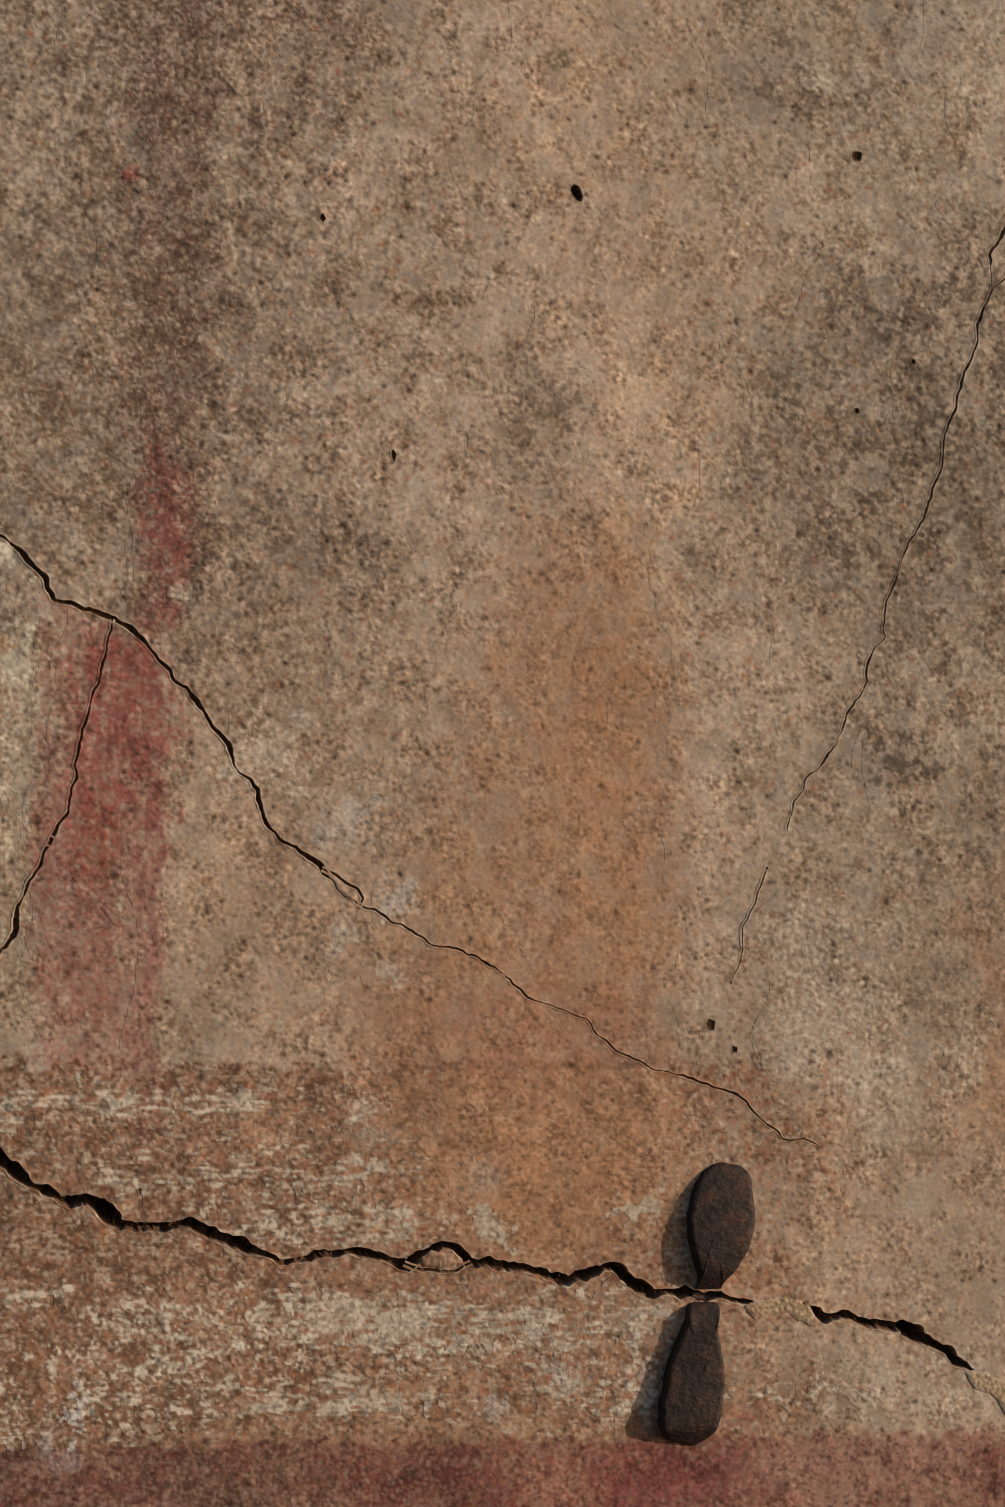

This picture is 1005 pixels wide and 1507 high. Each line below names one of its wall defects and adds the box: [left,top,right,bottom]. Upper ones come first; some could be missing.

crack [784,222,1005,831]
crack [0,532,820,1149]
crack [0,1145,1005,1412]